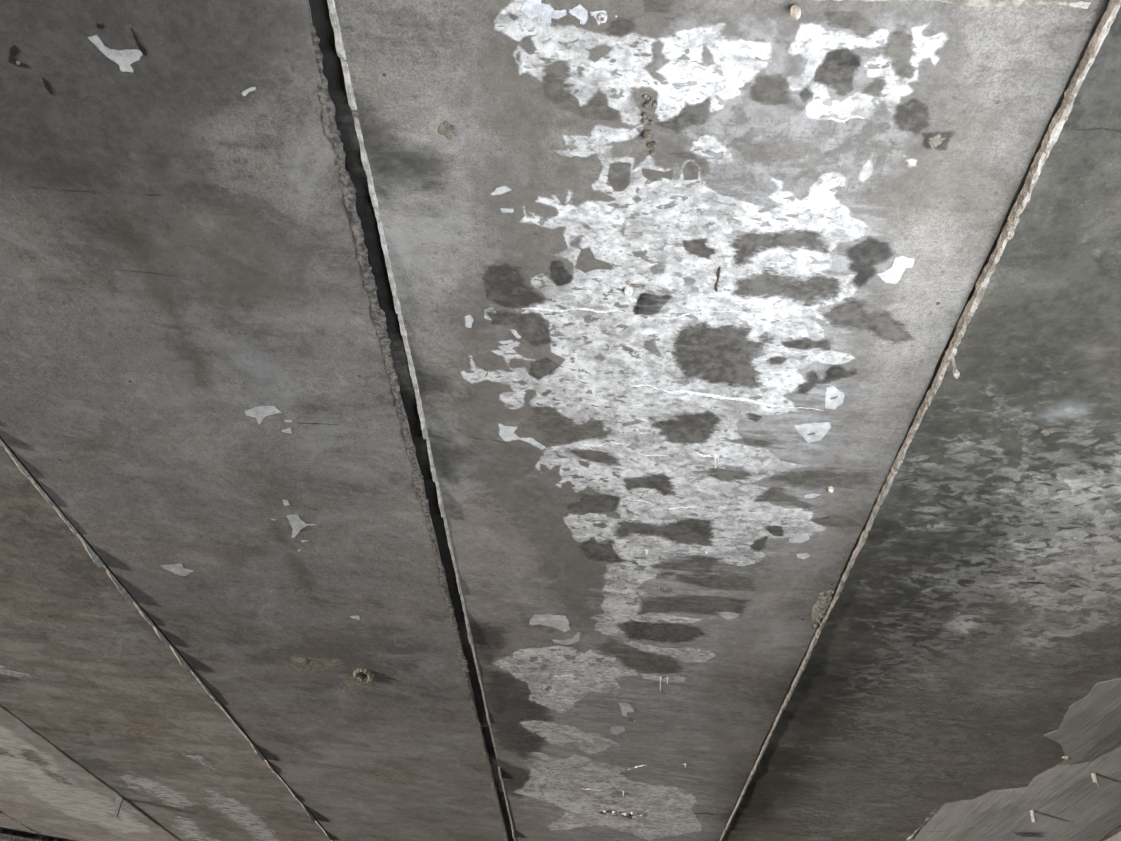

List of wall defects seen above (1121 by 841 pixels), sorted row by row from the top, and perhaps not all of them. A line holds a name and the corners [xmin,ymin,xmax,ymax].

peeling [88,24,147,73]
spalling [923,133,953,150]
flaking render [624,283,646,303]
peeling [878,256,915,284]
peeling [244,406,293,434]
leakage [461,0,948,841]
peeling [794,386,845,443]
leakage [734,0,1121,841]
peeling [270,499,316,553]
peeling [160,563,194,576]